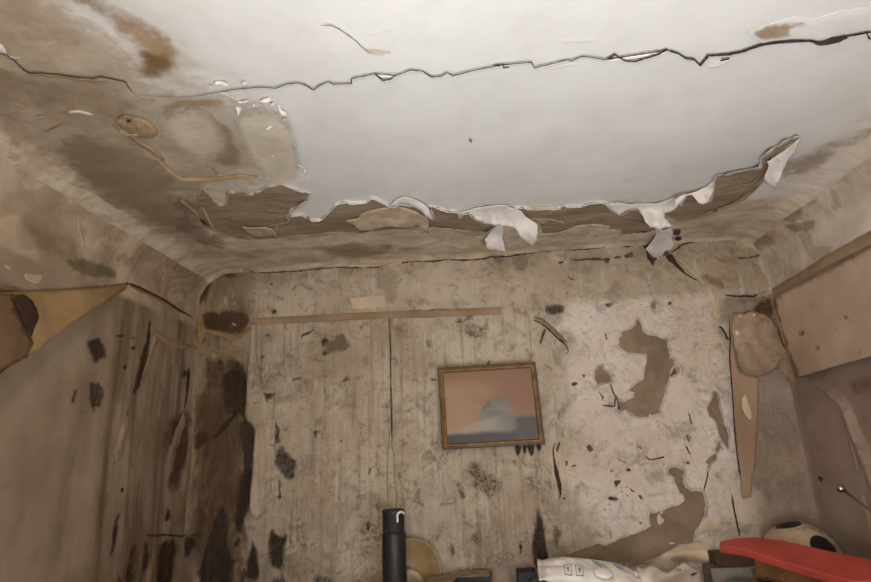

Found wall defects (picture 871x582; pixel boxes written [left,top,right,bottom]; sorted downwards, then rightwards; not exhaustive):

leakage [113,17,173,72]
crack [0,25,871,102]
flaking render [747,7,871,43]
leakage [238,114,296,180]
peeling [195,136,801,266]
peeling [0,283,129,374]
mould [88,339,105,362]
peeling [533,317,570,355]
peeling [593,316,684,420]
leakage [119,360,259,582]
peeling [566,336,759,567]
leakage [269,530,286,582]